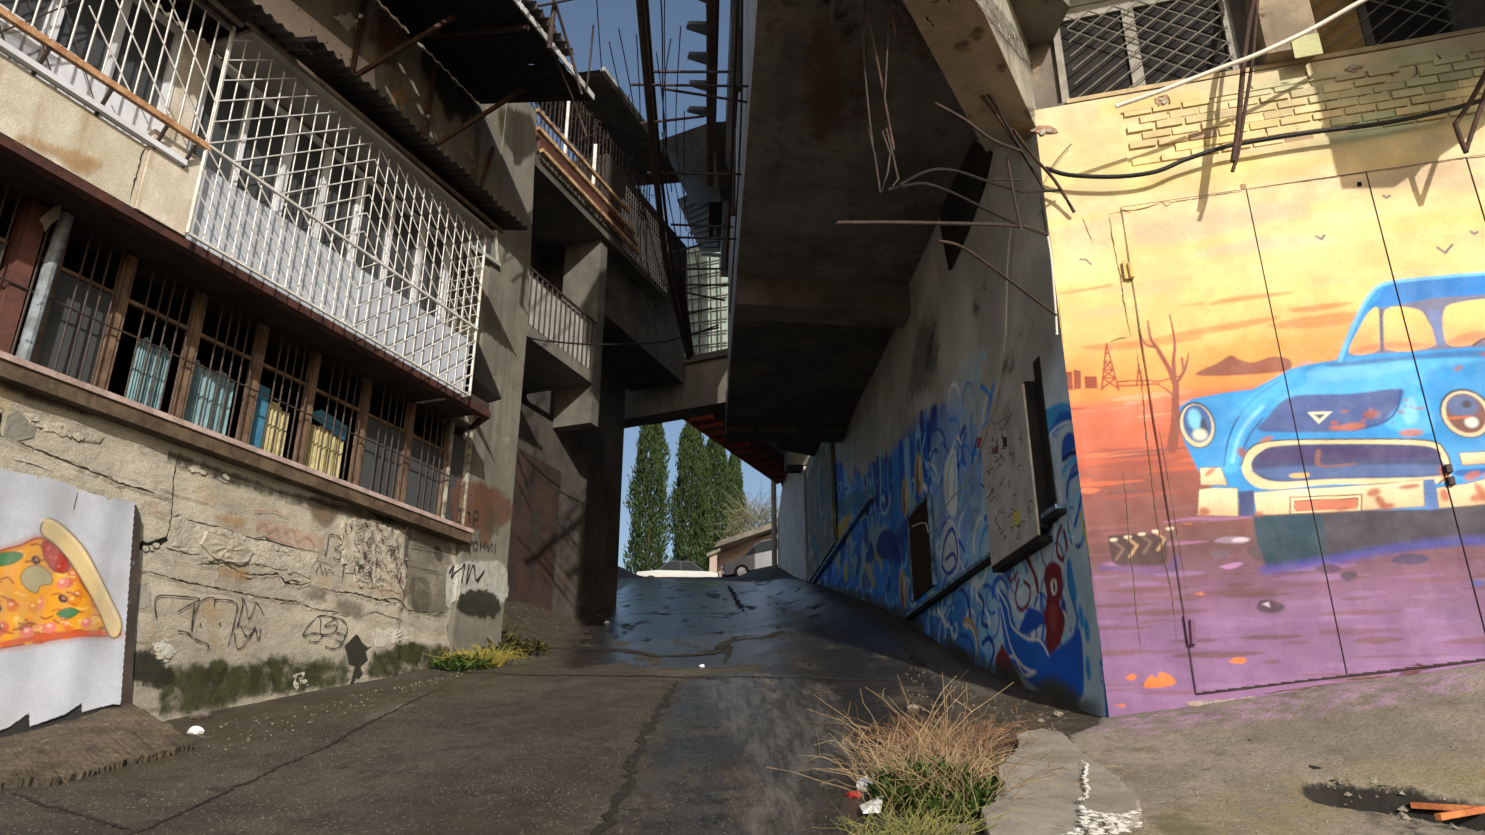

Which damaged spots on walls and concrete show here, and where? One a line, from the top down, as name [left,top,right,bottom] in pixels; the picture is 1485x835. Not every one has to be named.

spalling [24,413,104,443]
crack [0,407,447,622]
spalling [142,517,319,579]
spalling [340,517,408,596]
peeling [152,638,176,663]
peeling [372,625,413,647]
damp [399,642,422,664]
damp [208,660,227,685]
damp [268,657,287,688]